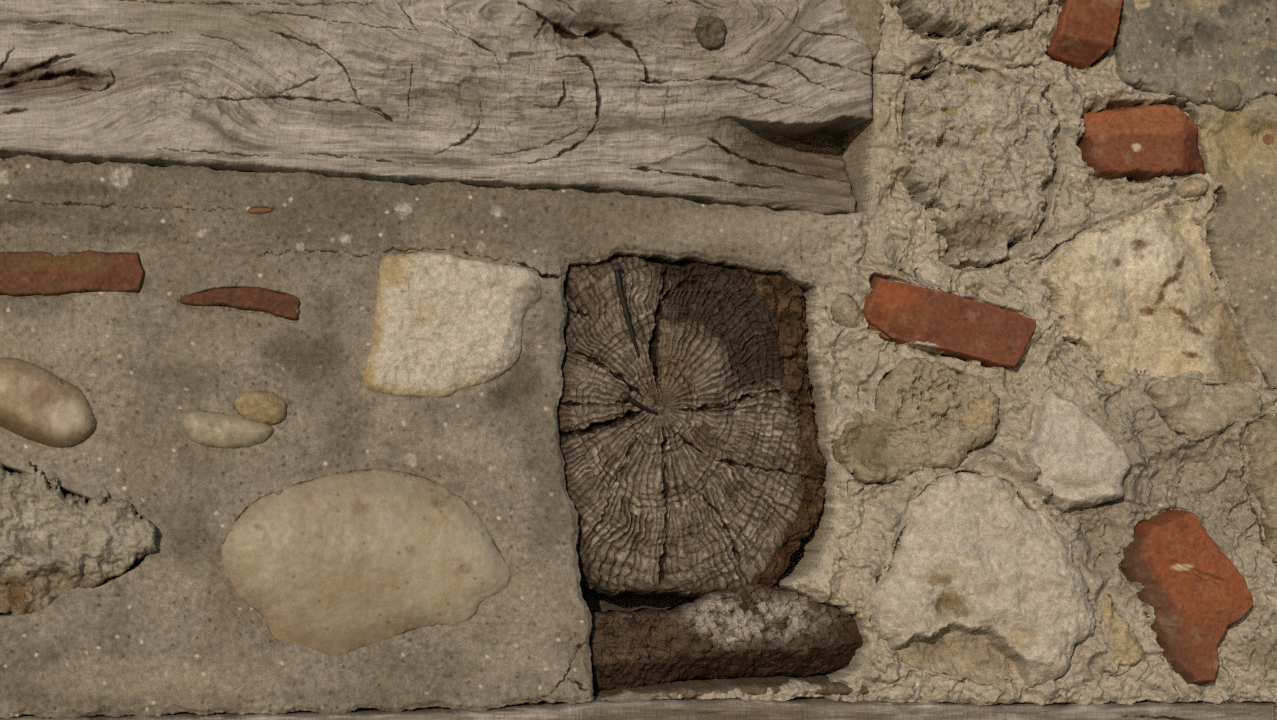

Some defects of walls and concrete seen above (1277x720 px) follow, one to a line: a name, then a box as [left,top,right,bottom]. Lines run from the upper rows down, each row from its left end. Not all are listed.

crack [1123,712,1185,720]